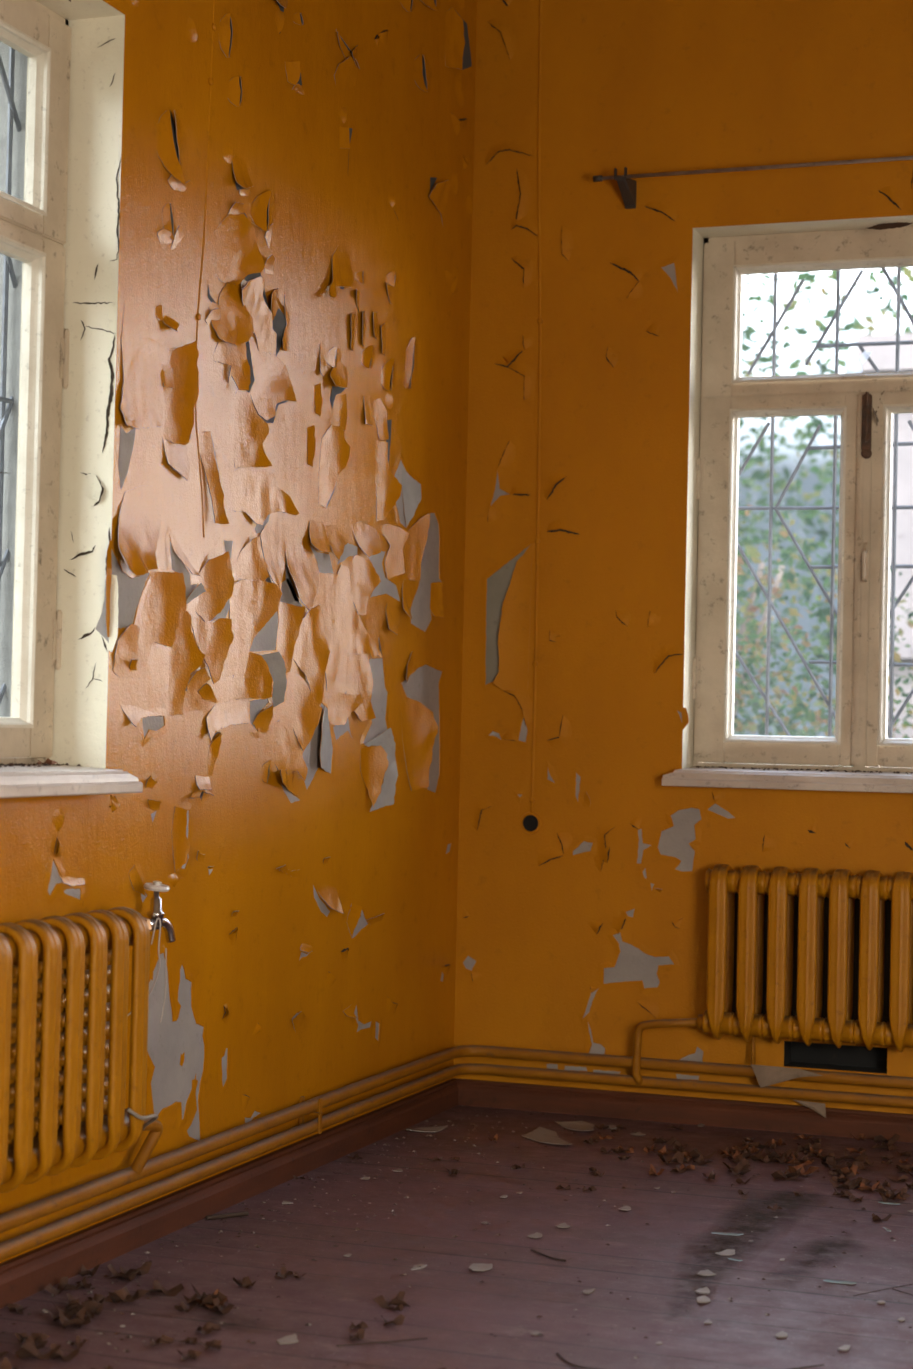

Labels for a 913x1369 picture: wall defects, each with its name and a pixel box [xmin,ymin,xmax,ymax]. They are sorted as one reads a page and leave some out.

peeling [156,110,192,250]
peeling [80,141,444,887]
flaking render [42,837,85,908]
peeling [310,879,385,945]
flaking render [629,791,742,878]
flaking render [146,944,231,1145]
flaking render [542,904,680,1075]